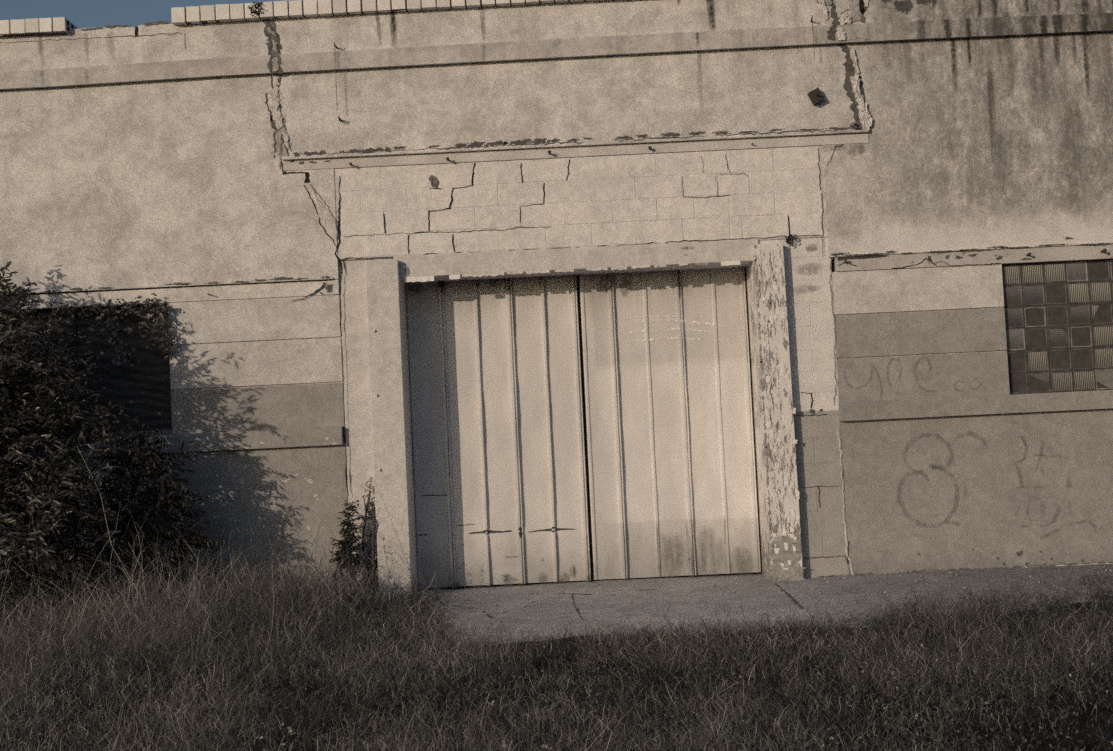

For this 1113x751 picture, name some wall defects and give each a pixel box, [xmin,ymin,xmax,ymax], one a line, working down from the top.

water stain [882,0,936,32]
water stain [945,0,1003,70]
water stain [1021,0,1113,85]
crack [263,0,873,575]
peeling [754,245,873,581]